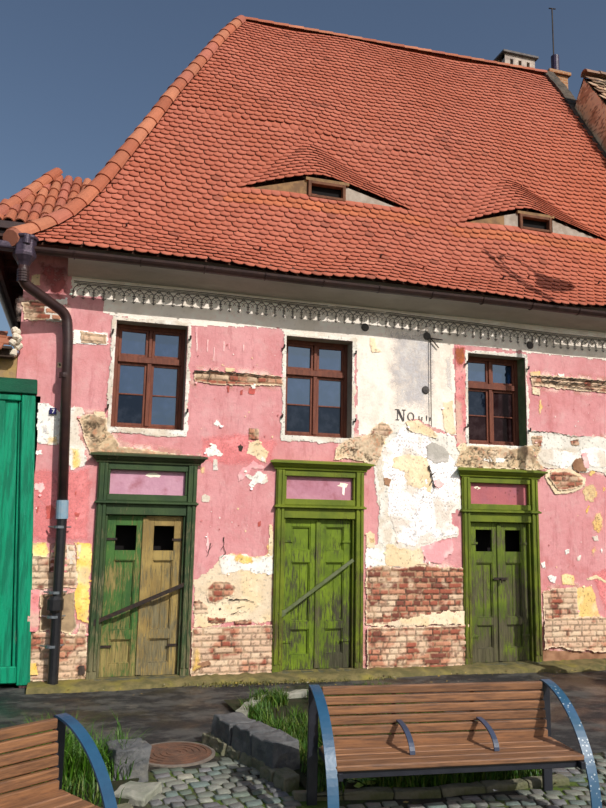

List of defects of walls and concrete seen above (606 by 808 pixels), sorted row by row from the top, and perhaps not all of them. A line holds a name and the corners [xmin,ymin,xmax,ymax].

spalling [18,299,61,321]
spalling [191,367,284,389]
spalling [530,373,606,396]
peeling [36,403,60,455]
flaking render [69,406,189,470]
peeling [199,443,223,470]
spalling [32,542,55,593]
spalling [334,420,606,669]
spalling [58,542,92,680]
spalling [190,524,274,676]
spalling [30,628,50,681]